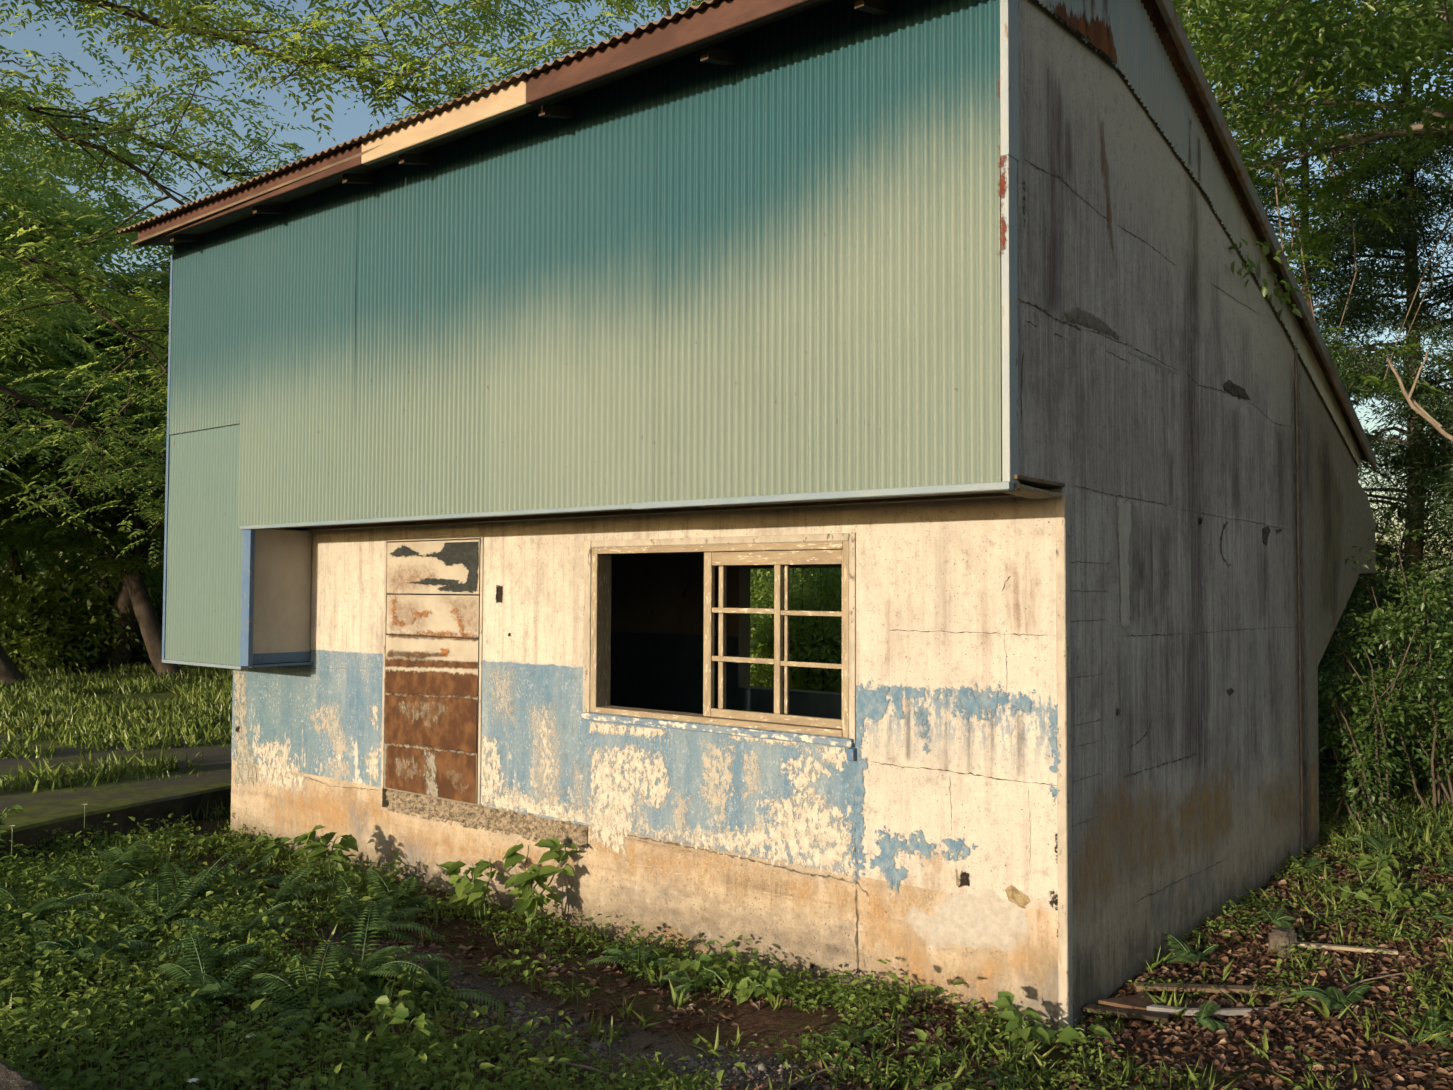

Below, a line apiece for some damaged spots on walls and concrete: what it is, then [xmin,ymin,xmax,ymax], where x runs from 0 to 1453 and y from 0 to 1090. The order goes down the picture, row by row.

rust [1050,0,1117,64]
rust [997,129,1009,254]
rust [1101,131,1115,255]
peeling [390,542,478,594]
spalling [495,585,503,603]
peeling [233,668,307,796]
rust [384,596,477,804]
peeling [310,676,1061,955]